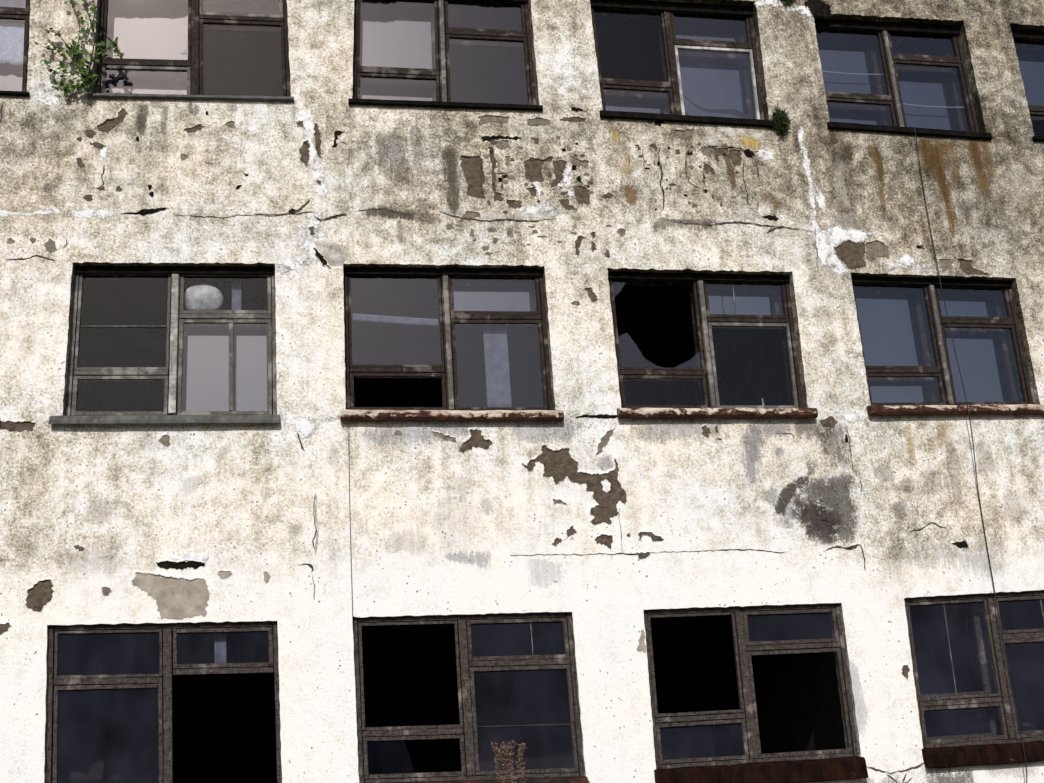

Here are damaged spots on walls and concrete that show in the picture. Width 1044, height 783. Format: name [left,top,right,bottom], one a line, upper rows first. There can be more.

crack [122,200,409,220]
spalling [445,106,626,258]
rust [923,144,956,232]
rust [969,140,993,193]
spalling [814,226,990,276]
peeling [23,577,56,613]
peeling [130,553,233,621]
crack [301,494,319,594]
peeling [520,428,628,550]
crack [510,508,784,556]
leakage [775,466,856,544]
crack [823,544,866,570]